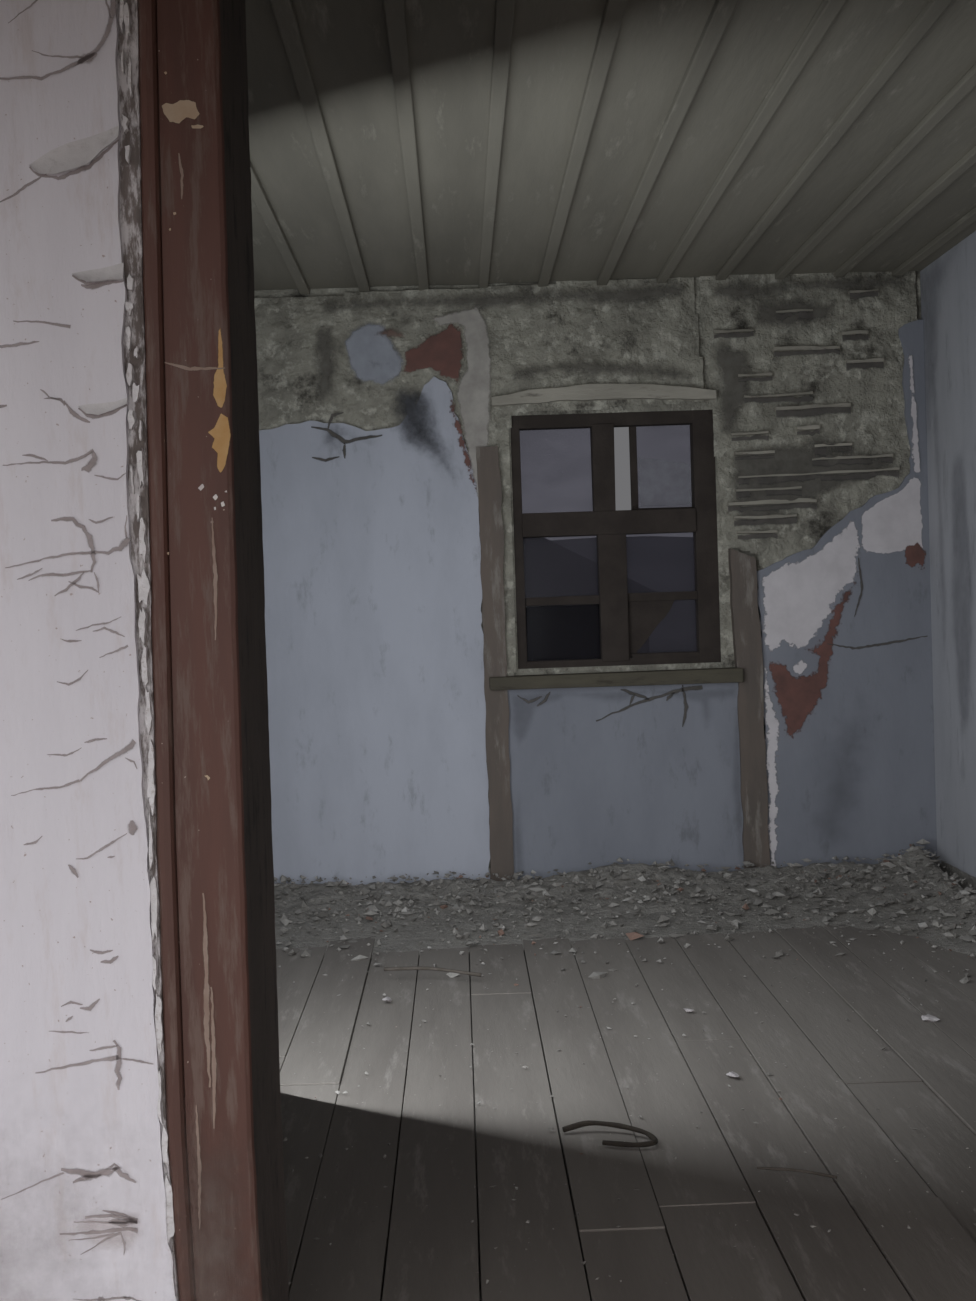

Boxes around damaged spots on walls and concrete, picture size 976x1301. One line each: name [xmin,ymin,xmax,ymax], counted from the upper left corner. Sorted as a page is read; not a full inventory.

crack [0,0,116,80]
peeling [162,100,204,129]
crack [3,389,126,480]
peeling [164,330,231,473]
crack [5,515,130,686]
peeling [198,484,227,640]
spalling [254,271,926,866]
crack [11,738,137,796]
crack [36,999,152,1090]
peeling [195,893,217,1229]
crack [1,1163,136,1200]
crack [60,1210,138,1255]